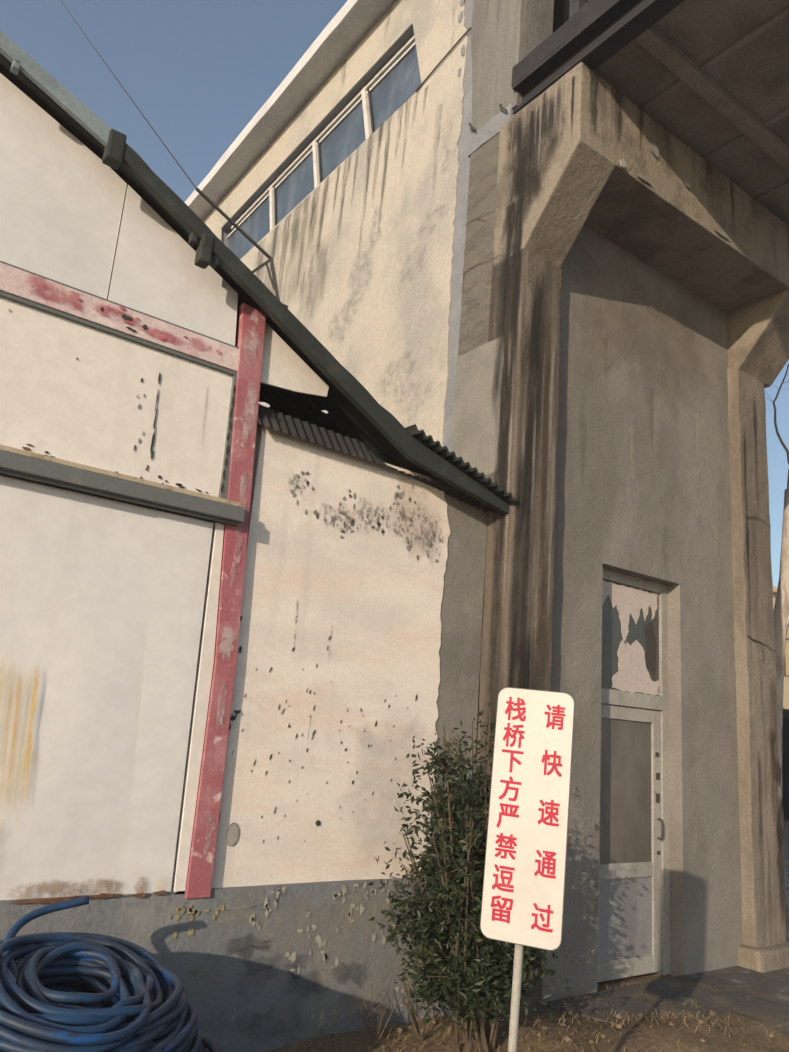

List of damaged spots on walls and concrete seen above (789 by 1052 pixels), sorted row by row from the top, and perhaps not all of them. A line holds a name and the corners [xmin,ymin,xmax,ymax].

water stain [272,156,370,258]
water stain [369,123,389,194]
peeling [33,278,82,309]
peeling [96,305,221,354]
water stain [495,93,557,488]
peeling [134,373,161,469]
peeling [220,386,256,492]
water stain [517,285,550,577]
flaking render [290,470,488,848]
water stain [490,513,504,681]
water stain [509,592,530,689]
peeling [285,912,339,974]